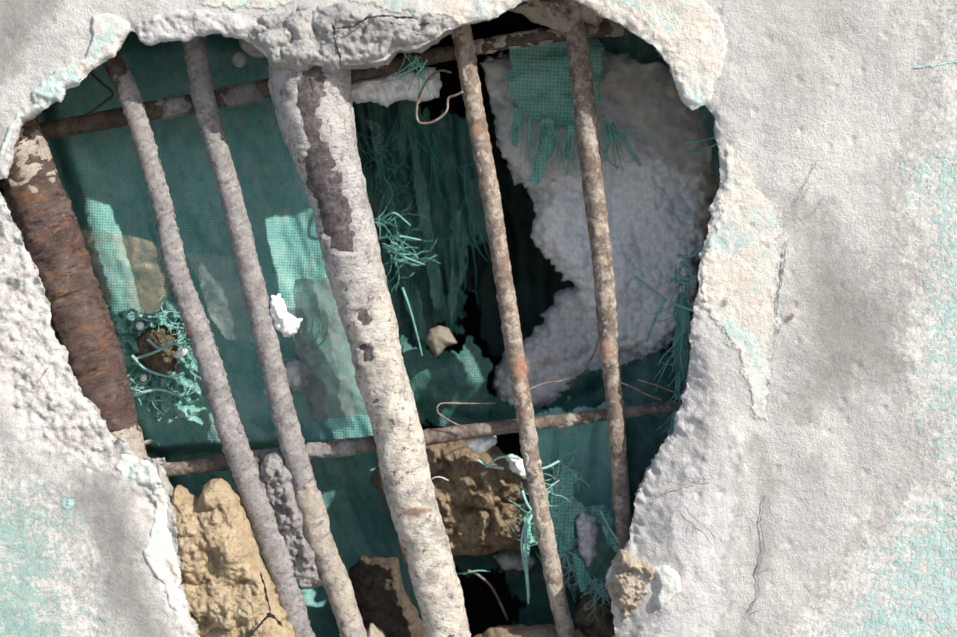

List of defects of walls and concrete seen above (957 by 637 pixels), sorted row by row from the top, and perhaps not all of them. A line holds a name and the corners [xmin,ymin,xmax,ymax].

crack [331,15,430,66]
spalling [0,0,729,637]
flaking render [695,125,794,421]